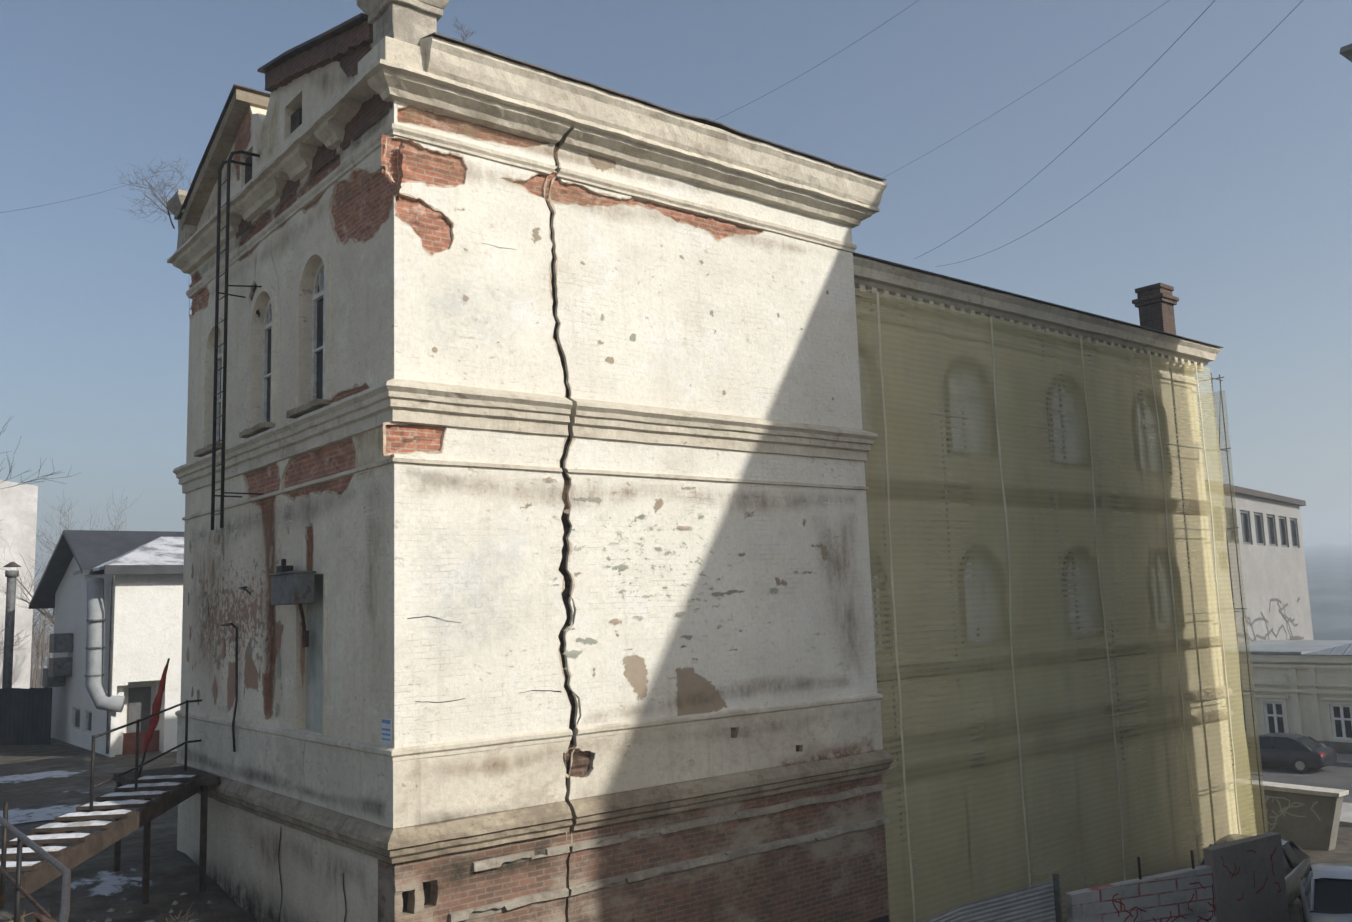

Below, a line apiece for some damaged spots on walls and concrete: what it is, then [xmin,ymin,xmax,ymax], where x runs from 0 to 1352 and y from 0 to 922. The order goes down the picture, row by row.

flaking render [238,105,546,262]
flaking render [501,170,767,242]
flaking render [243,437,356,508]
flaking render [382,422,447,457]
crack [521,141,579,917]
peeling [563,483,630,550]
peeling [603,499,744,617]
peeling [186,528,284,720]
peeling [563,628,597,669]
peeling [623,648,648,700]
peeling [676,635,726,716]
flaking render [563,744,591,779]